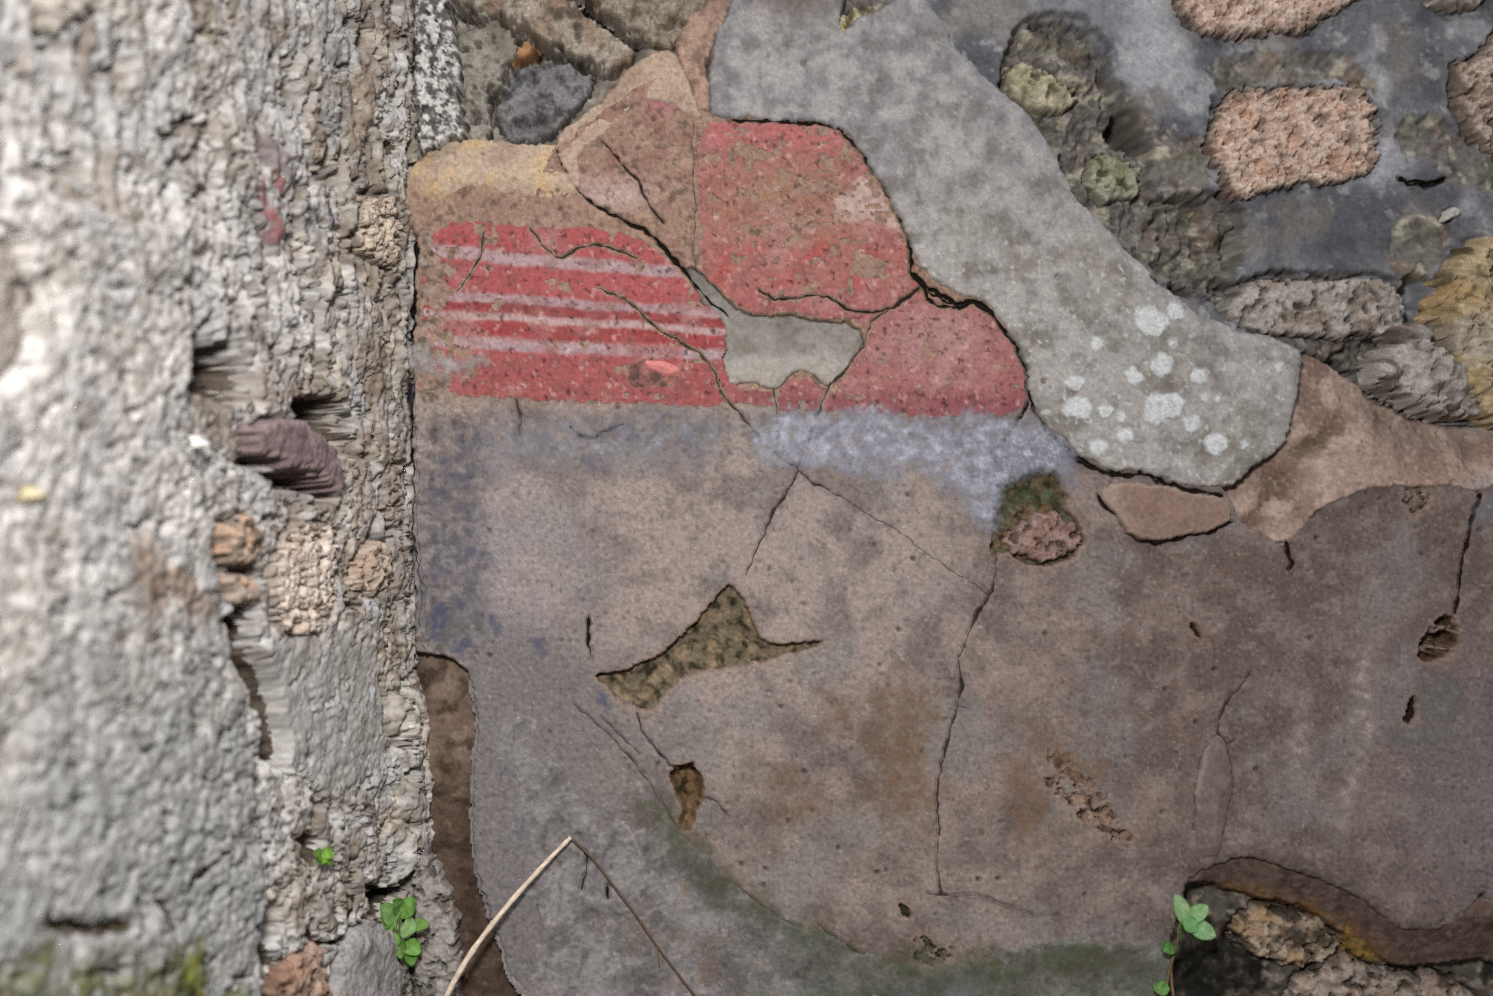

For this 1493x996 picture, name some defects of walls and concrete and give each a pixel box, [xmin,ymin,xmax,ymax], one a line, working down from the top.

crack [529,123,729,317]
crack [456,230,485,291]
crack [515,399,523,434]
crack [600,119,1233,917]
crack [584,617,592,656]
spalling [597,585,818,709]
spalling [1417,615,1457,662]
spalling [1402,696,1415,724]
crack [573,703,680,828]
spalling [670,762,705,830]
spalling [1044,750,1132,842]
crack [581,853,609,898]